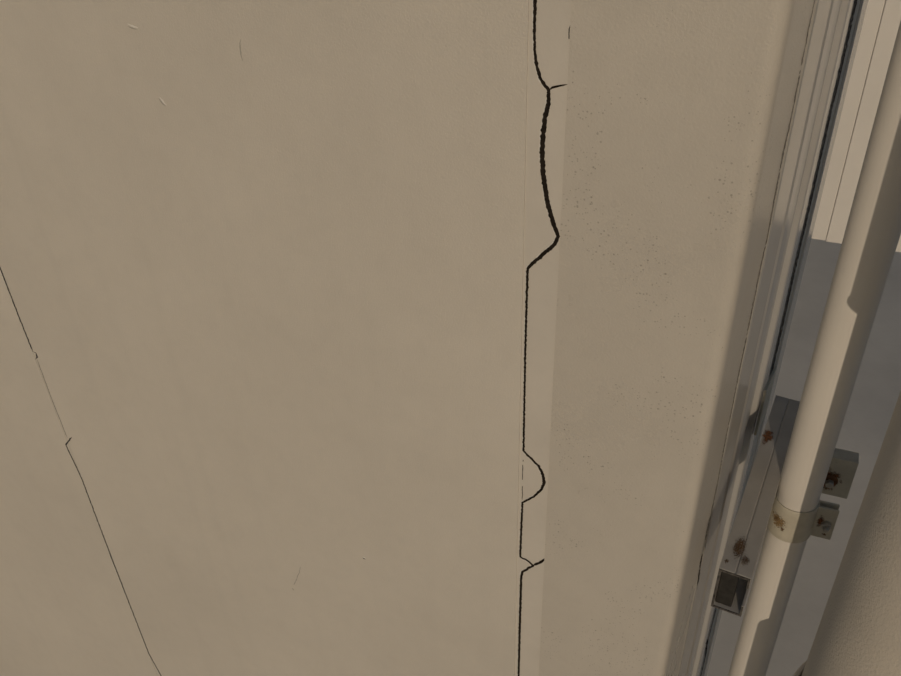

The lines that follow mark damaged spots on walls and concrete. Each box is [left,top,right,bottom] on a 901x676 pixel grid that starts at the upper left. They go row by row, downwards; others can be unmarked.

crack [0,268,161,676]
crack [517,0,567,676]
rust [725,533,749,565]